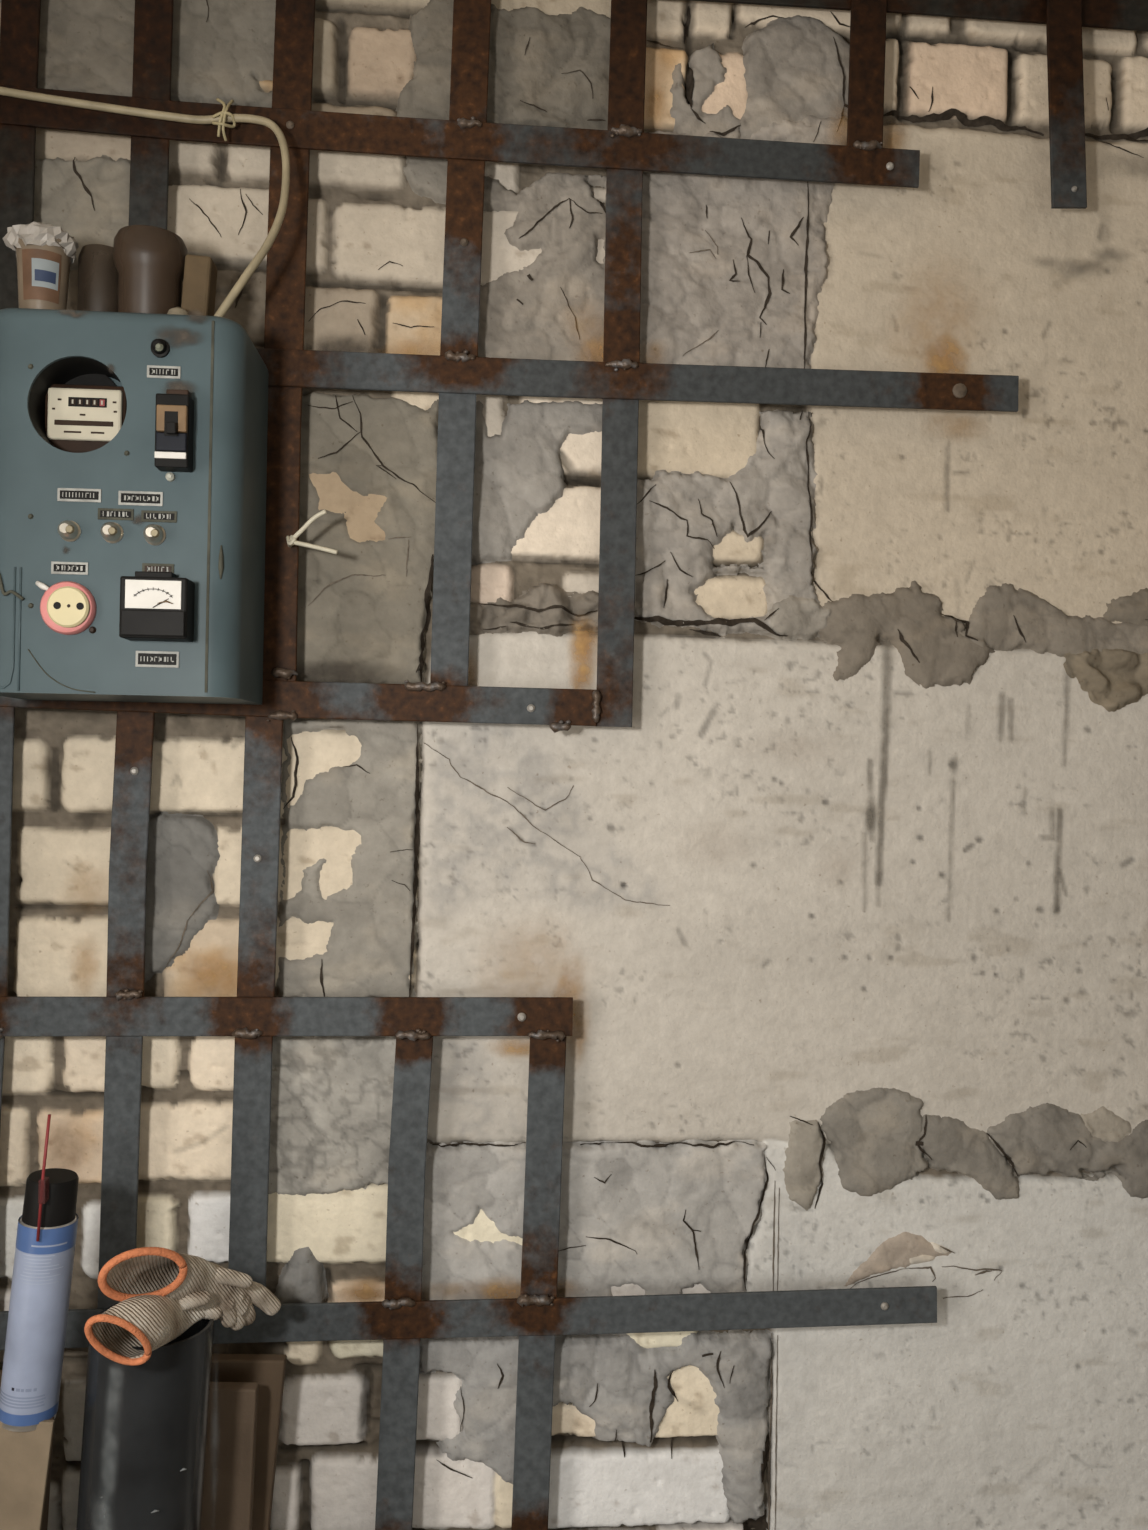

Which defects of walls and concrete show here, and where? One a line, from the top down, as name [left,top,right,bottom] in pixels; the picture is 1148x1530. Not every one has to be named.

crack [647,6,741,136]
crack [884,87,1044,136]
flaking render [640,171,835,369]
crack [689,181,809,369]
rust [929,340,960,373]
flaking render [634,409,820,639]
rust [574,626,593,688]
flaking render [276,718,423,997]
crack [391,724,670,997]
leakage [867,708,888,881]
rust [486,1285,520,1299]
flaking render [557,1139,767,1297]